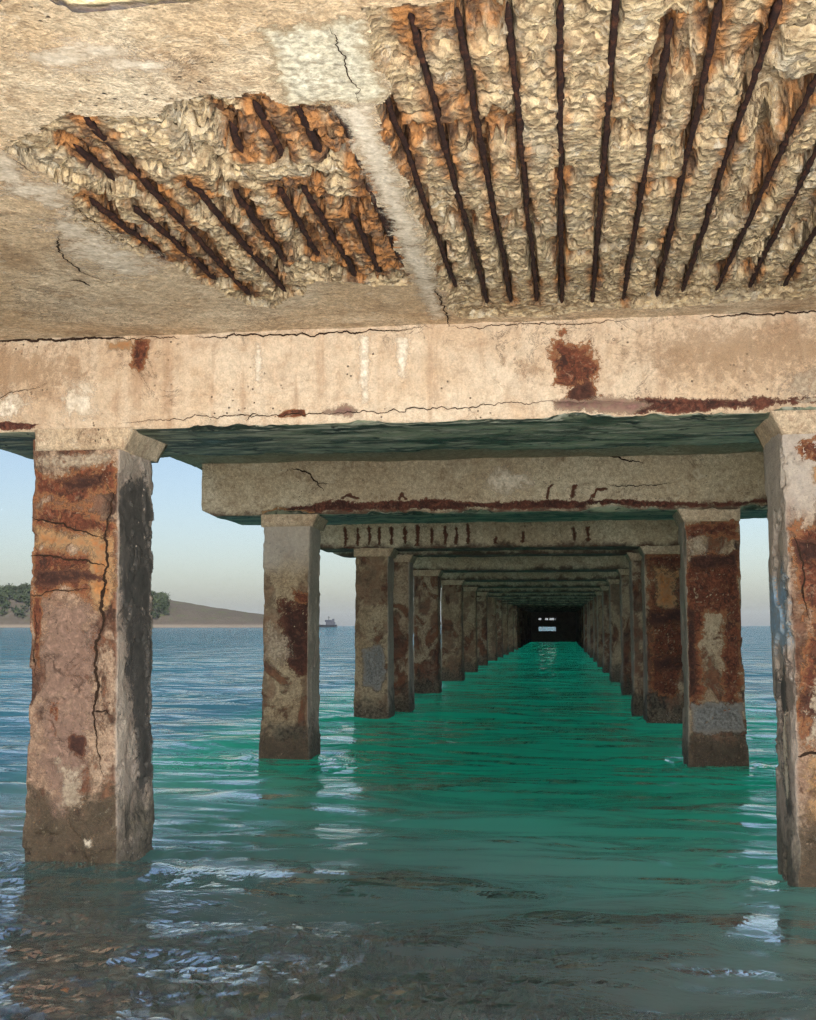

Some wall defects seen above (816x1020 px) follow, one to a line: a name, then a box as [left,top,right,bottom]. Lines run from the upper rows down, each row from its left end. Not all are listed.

spalling [50,0,185,13]
spalling [0,92,412,309]
spalling [361,0,816,319]
corrosion [107,339,151,372]
crack [0,287,636,342]
corrosion [547,324,652,415]
crack [32,492,115,776]
corrosion [30,452,118,668]
corrosion [264,587,308,677]
corrosion [645,518,744,711]
corrosion [787,502,816,821]
crack [794,536,815,619]